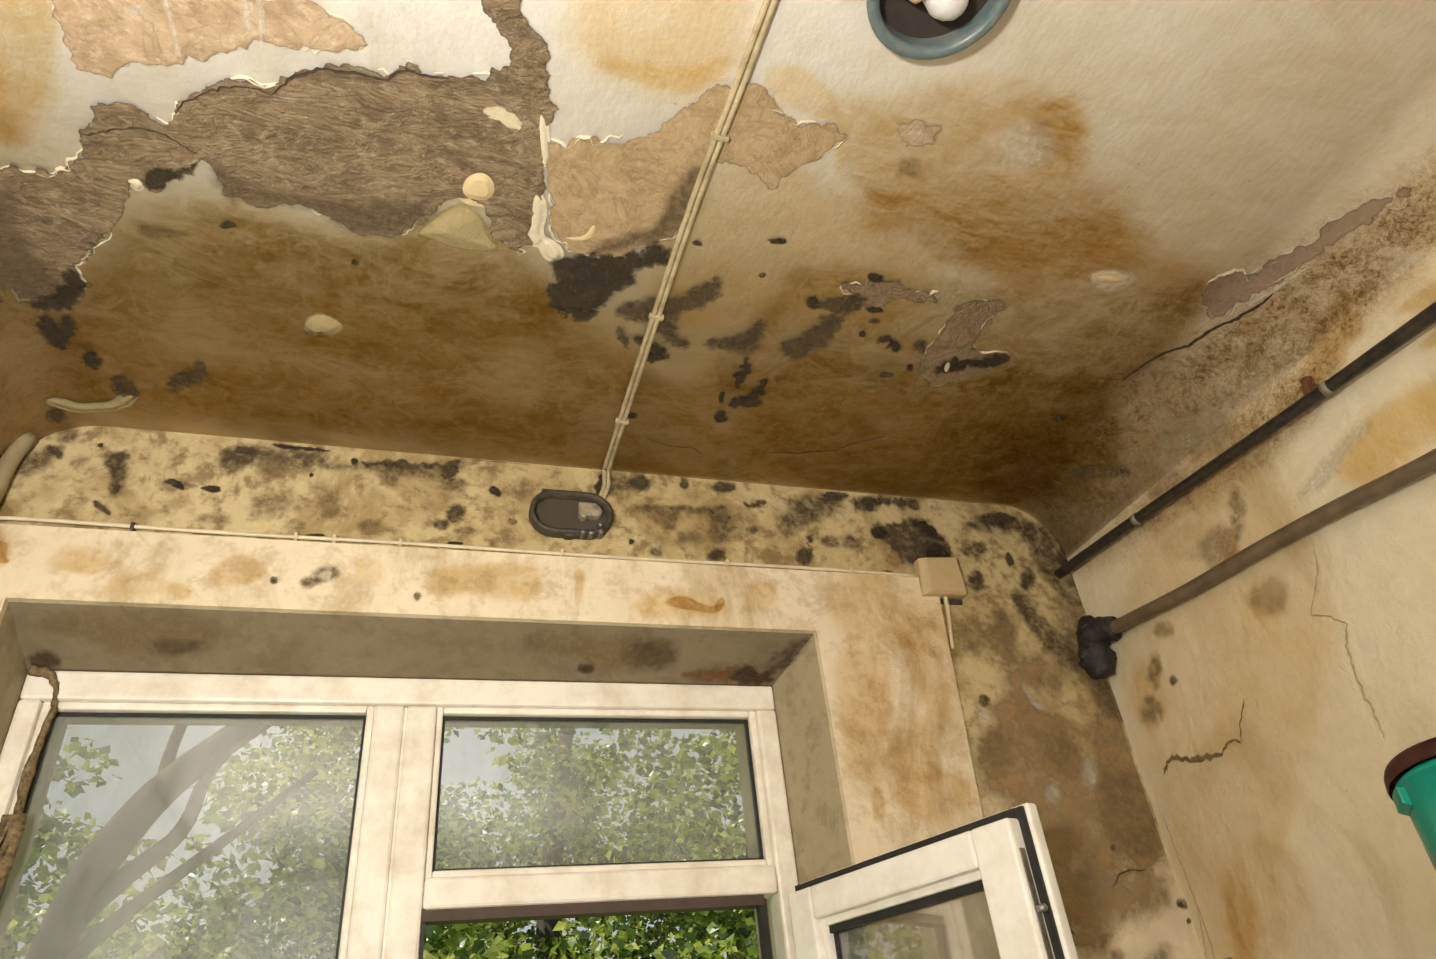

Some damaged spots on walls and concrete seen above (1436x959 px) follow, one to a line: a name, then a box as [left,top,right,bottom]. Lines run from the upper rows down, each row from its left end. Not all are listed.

flaking render [0,0,850,304]
mould [538,237,721,363]
mould [781,273,939,393]
peeling [918,299,1009,386]
mould [17,377,149,474]
mould [93,443,129,515]
mould [164,479,221,493]
mould [220,444,474,545]
mould [594,475,767,560]
damp [782,492,1086,671]
crack [1310,549,1384,738]
crack [1164,702,1244,775]